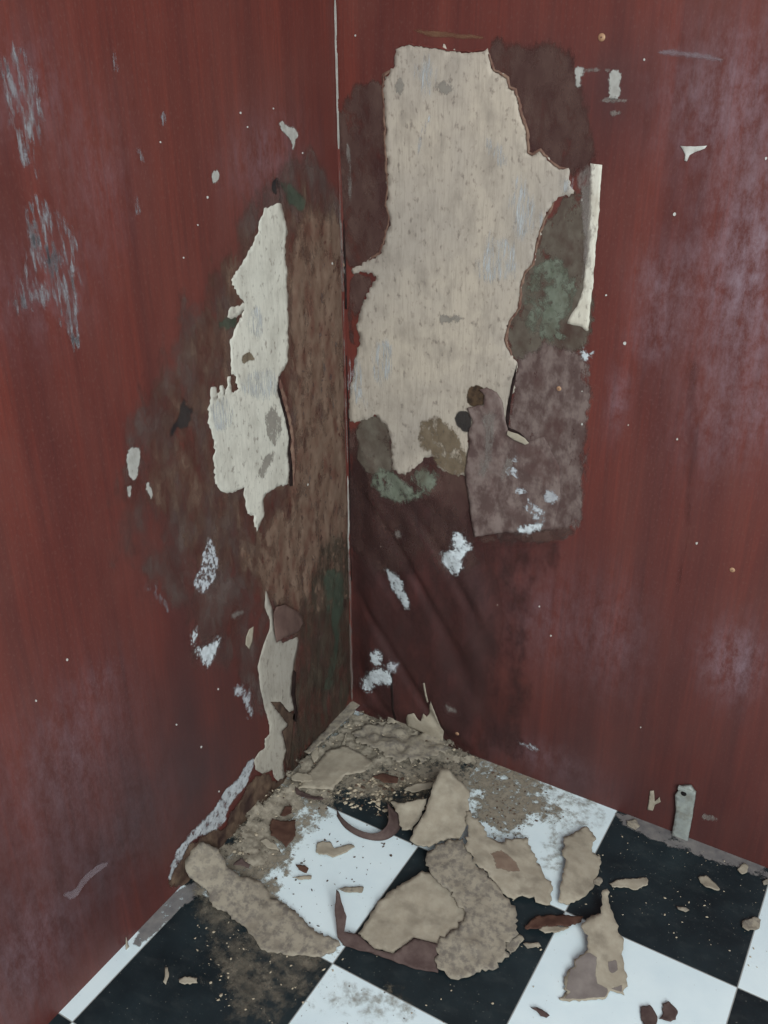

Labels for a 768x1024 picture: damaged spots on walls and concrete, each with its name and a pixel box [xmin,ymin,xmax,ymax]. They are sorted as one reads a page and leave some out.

water stain [489,38,595,176]
peeling [575,67,626,115]
water stain [17,196,80,347]
water stain [239,80,391,344]
water stain [507,187,594,361]
peeling [567,163,602,331]
peeling [126,187,351,764]
water stain [126,271,558,774]
peeling [455,342,591,544]